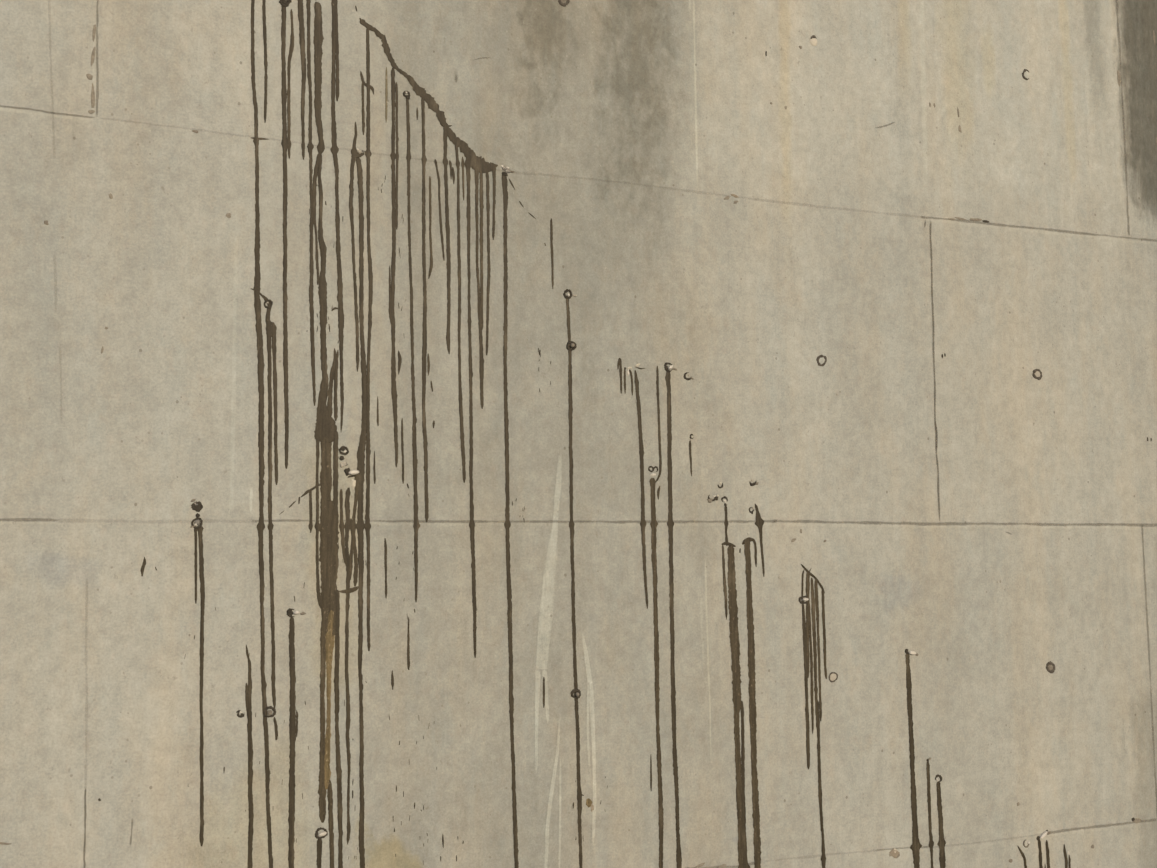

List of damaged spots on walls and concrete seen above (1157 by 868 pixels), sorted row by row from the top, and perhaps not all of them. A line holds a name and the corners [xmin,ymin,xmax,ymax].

leakage [1079,0,1157,471]
leakage [1122,530,1157,868]